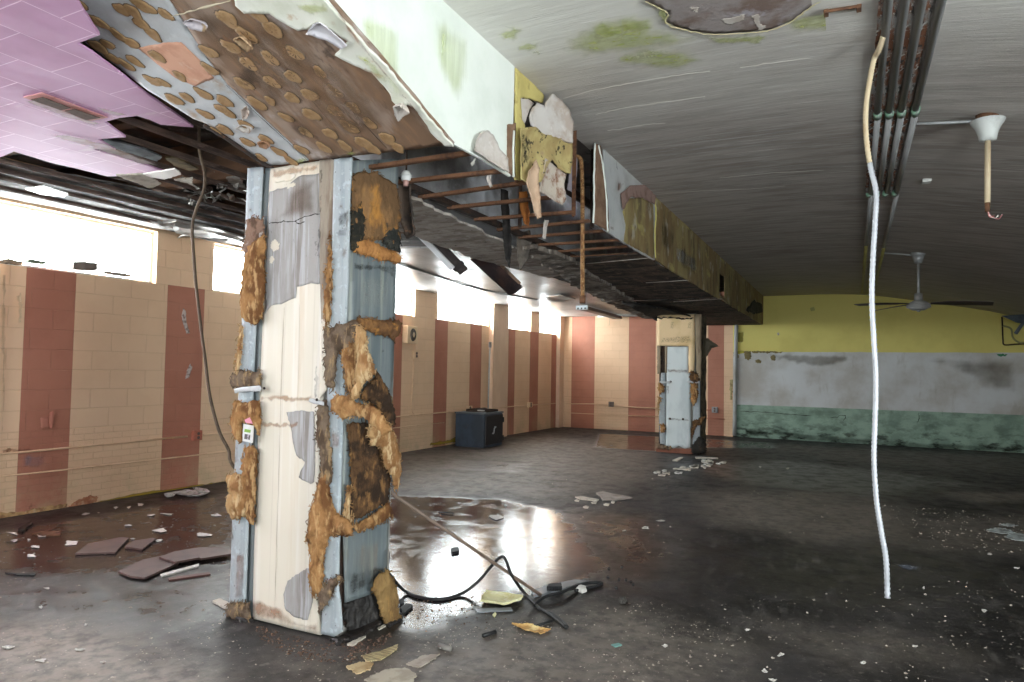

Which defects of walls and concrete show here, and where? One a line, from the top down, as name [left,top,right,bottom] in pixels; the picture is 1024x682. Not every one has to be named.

peeling [645,0,812,33]
peeling [265,172,320,313]
peeling [286,410,315,484]
peeling [283,568,313,620]